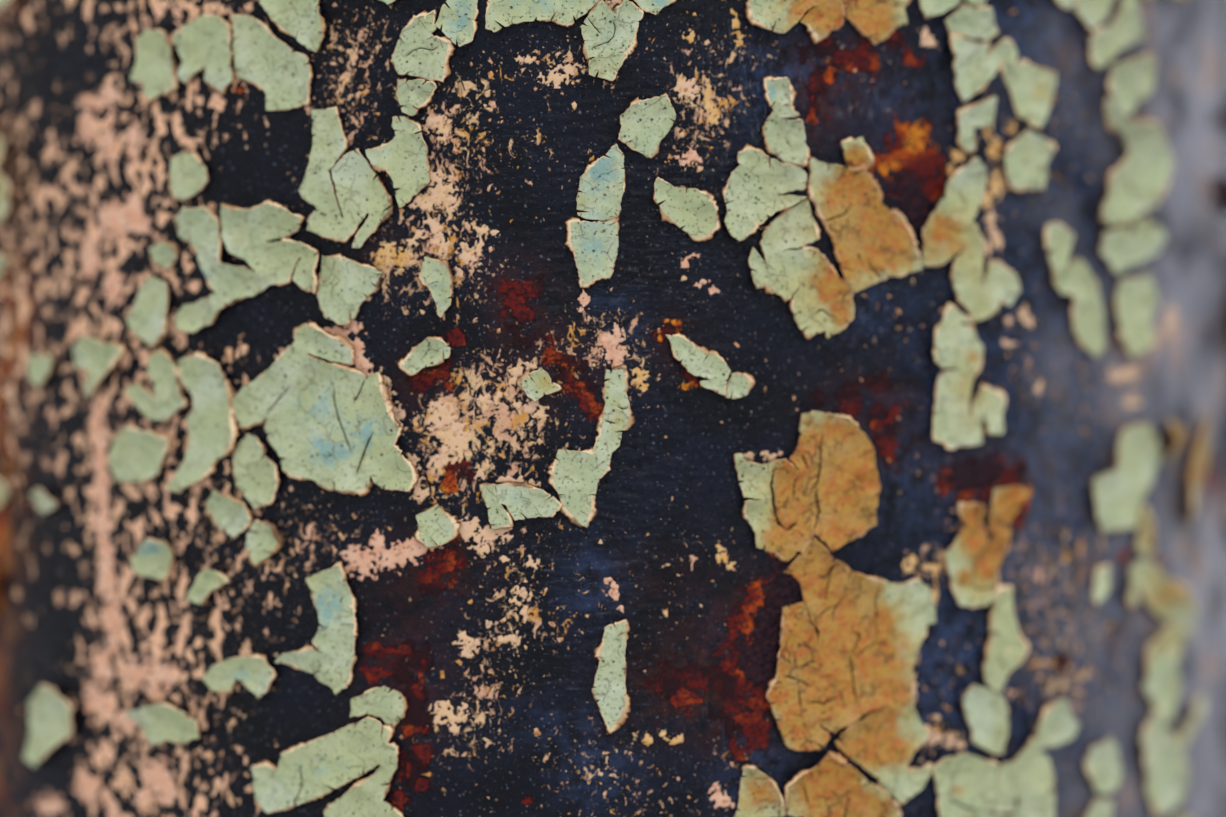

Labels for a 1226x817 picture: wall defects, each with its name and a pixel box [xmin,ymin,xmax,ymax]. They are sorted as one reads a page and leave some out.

peeling [108,0,677,567]
rust [488,274,603,420]
peeling [653,0,1057,451]
rust [799,31,926,132]
rust [868,115,951,234]
peeling [1043,0,1173,359]
rust [440,459,476,495]
peeling [202,561,408,817]
rust [638,552,801,761]
crack [785,565,885,706]
peeling [734,410,1080,817]
peeling [1083,736,1122,817]